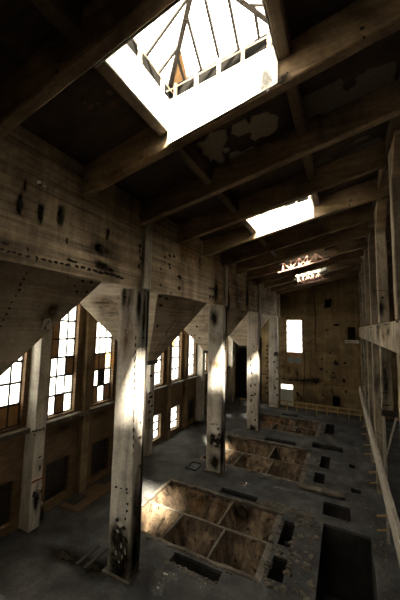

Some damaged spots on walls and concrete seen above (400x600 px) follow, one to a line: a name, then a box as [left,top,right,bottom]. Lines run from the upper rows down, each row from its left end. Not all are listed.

peeling [194,111,279,168]
peeling [109,503,130,580]